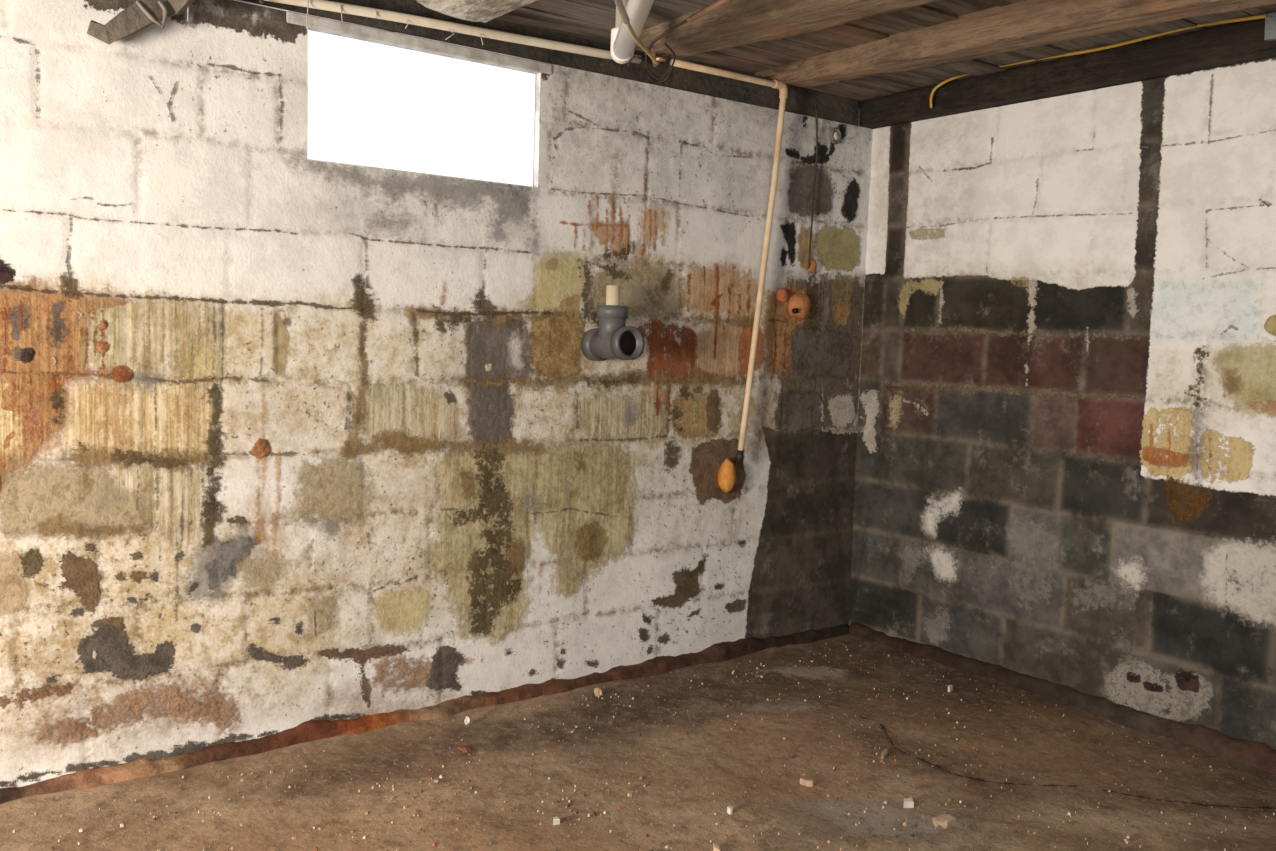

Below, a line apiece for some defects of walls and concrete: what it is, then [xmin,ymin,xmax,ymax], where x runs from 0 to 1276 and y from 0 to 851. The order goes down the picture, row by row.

corrosion [560,173,670,259]
spalling [0,259,15,285]
corrosion [0,277,137,492]
damp [284,158,722,646]
peeling [664,437,747,505]
corrosion [1139,407,1254,525]
peeling [187,502,260,595]
peeling [637,554,724,654]
spalling [0,542,278,788]
peeling [243,643,488,721]
spalling [1102,655,1215,723]
crack [861,717,1274,809]